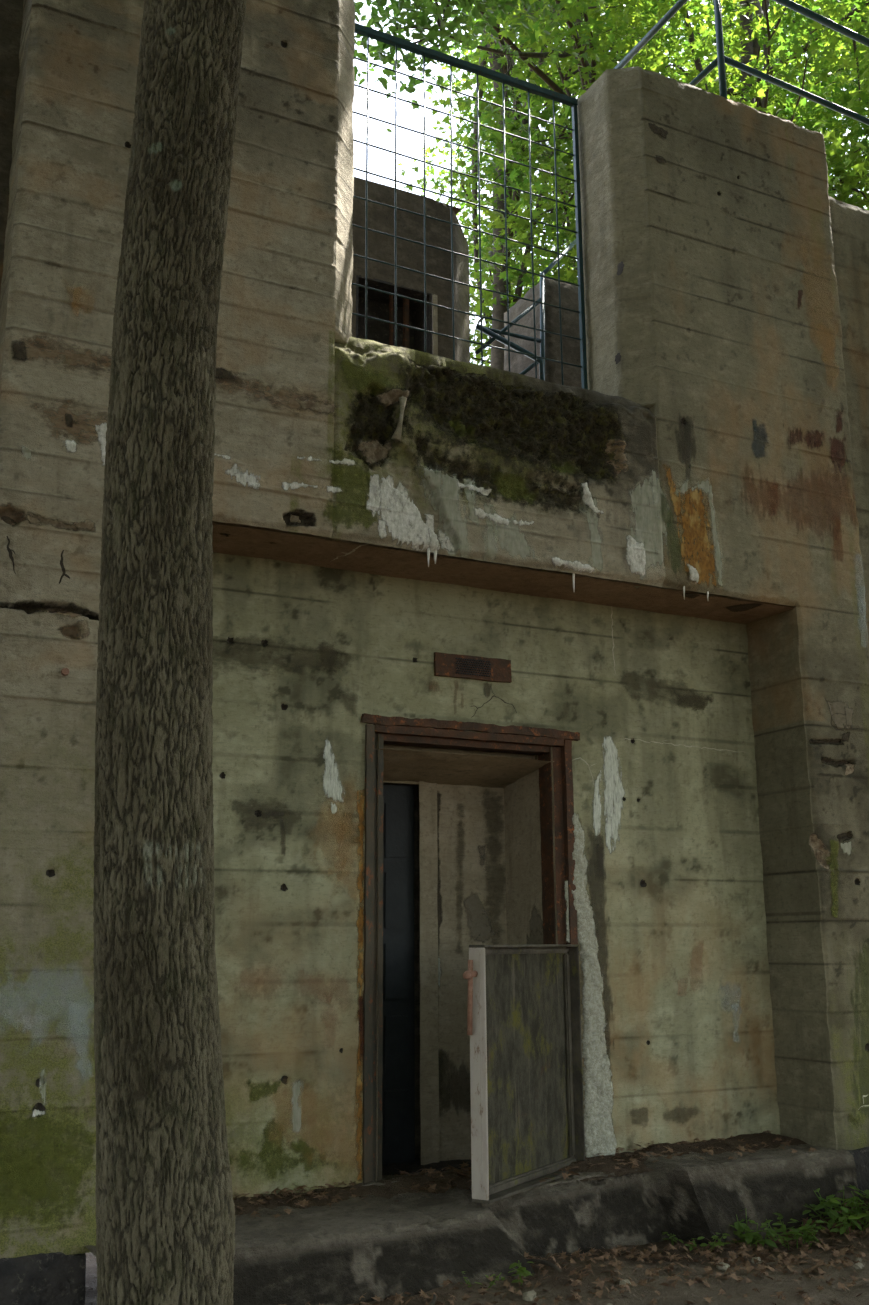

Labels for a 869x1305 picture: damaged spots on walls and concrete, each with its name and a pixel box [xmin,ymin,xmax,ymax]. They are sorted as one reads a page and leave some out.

spalling [12,336,112,372]
spalling [215,356,628,515]
rust [788,410,848,472]
spalling [0,503,95,532]
rust [664,465,722,587]
spalling [0,601,99,640]
spalling [809,831,853,871]
rust [355,789,365,1181]